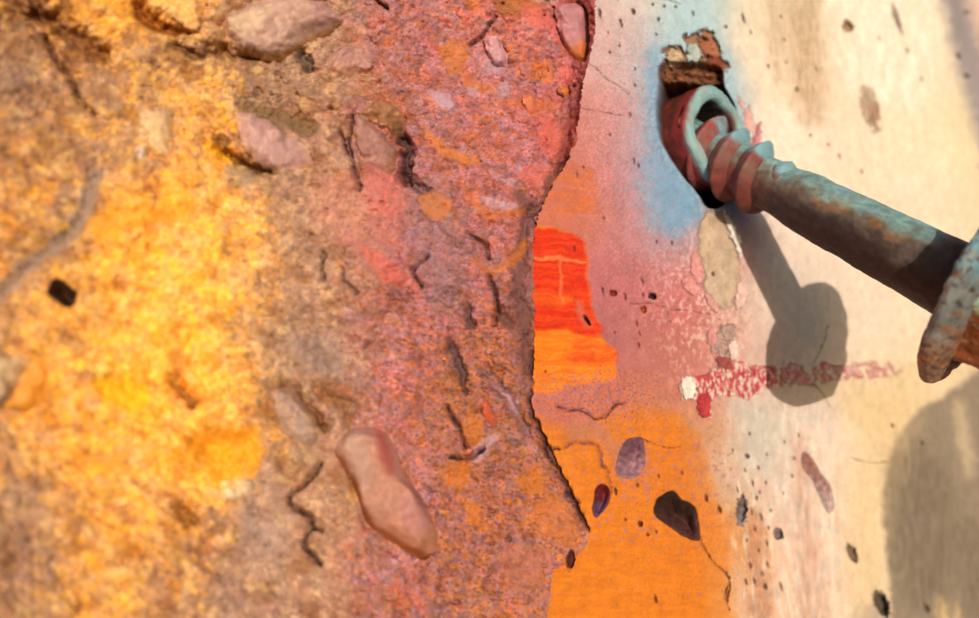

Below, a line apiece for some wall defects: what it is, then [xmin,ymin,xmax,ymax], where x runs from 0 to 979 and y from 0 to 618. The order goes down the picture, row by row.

spalling [662,30,730,74]
spalling [0,0,611,618]
crack [529,355,619,525]
spalling [616,437,645,479]
crack [290,463,323,566]